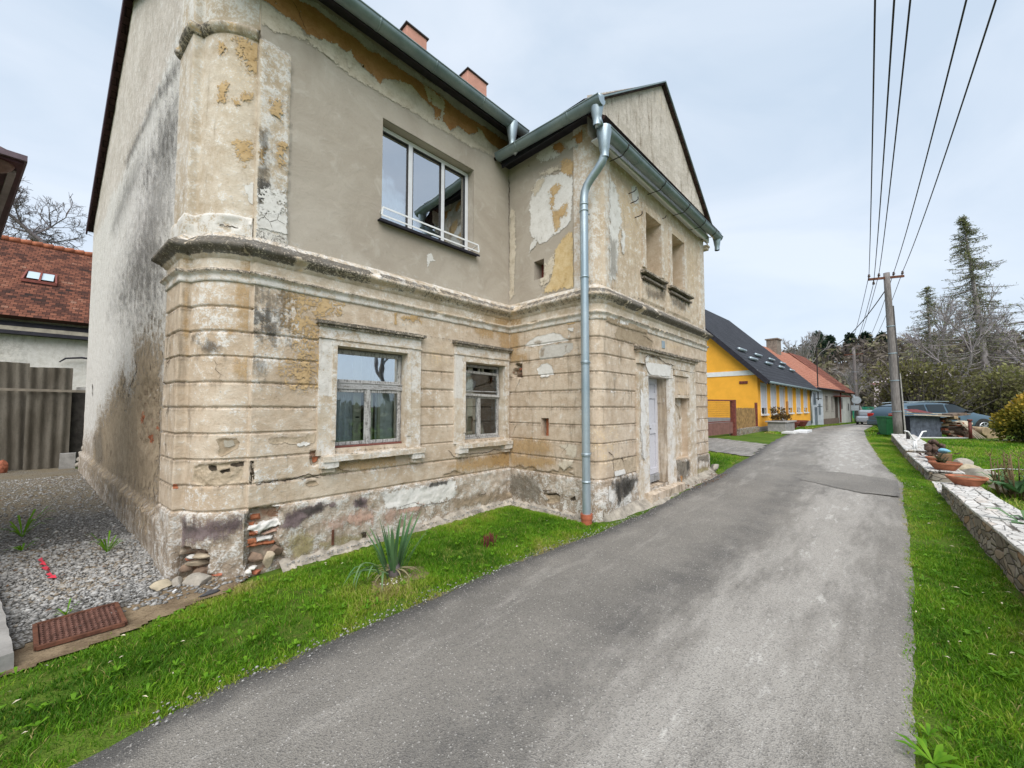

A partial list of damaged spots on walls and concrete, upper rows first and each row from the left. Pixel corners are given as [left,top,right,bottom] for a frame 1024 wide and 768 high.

peeling [217,35,258,77]
peeling [262,0,509,162]
peeling [231,138,290,168]
peeling [244,182,288,234]
peeling [529,130,582,293]
peeling [276,290,345,394]
peeling [525,327,574,377]
spalling [192,438,254,486]
leakage [612,475,639,505]
flaking render [245,506,285,575]
flaking render [182,552,222,582]